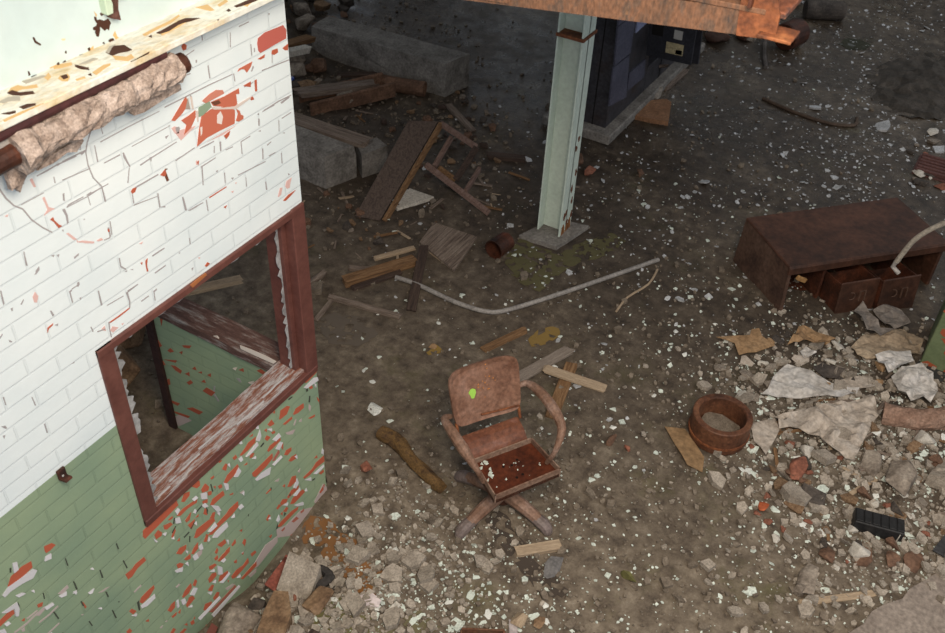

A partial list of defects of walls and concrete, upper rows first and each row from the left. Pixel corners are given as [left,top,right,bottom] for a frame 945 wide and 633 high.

corrosion [143,0,257,37]
flaking render [257,25,286,53]
corrosion [2,12,149,122]
spalling [171,88,244,146]
peeling [157,374,289,499]
flaking render [266,455,325,538]
flaking render [143,401,315,633]
peeling [8,561,32,587]
peeling [125,557,146,579]
peeling [0,610,25,626]
peeling [129,585,154,614]